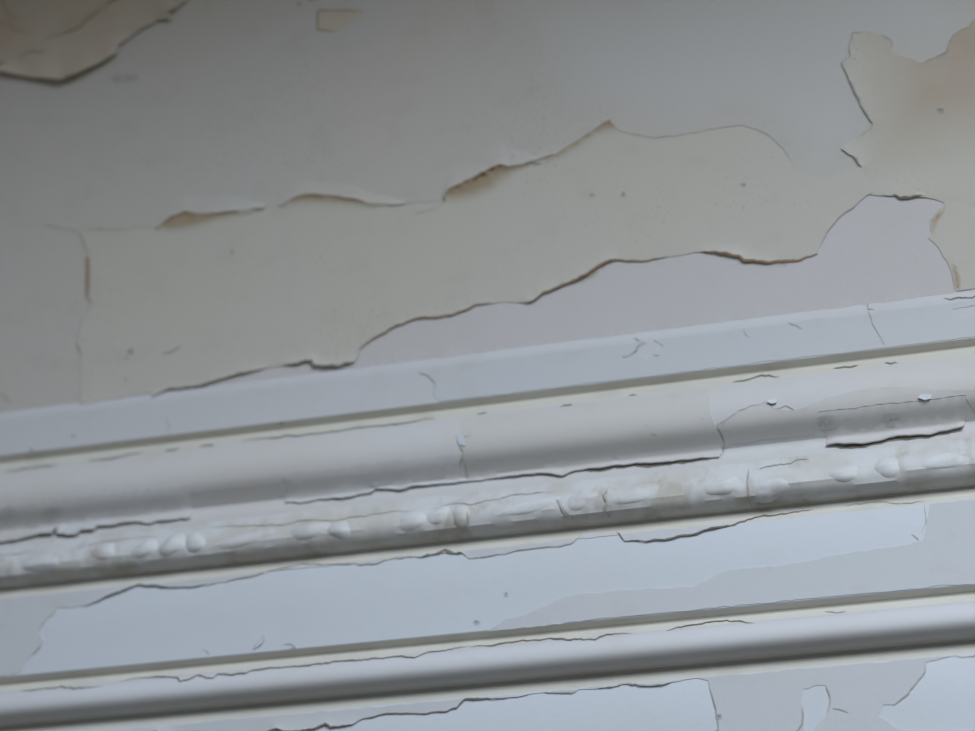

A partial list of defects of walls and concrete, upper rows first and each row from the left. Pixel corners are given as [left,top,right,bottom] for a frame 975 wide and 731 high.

peeling [0,0,186,80]
peeling [77,117,975,405]
crack [735,374,778,382]
crack [243,418,435,441]
peeling [0,483,193,544]
crack [204,491,574,530]
crack [747,458,807,507]
peeling [0,509,812,677]
peeling [488,499,975,632]
crack [670,620,751,630]
crack [22,633,630,691]
peeling [101,655,975,731]